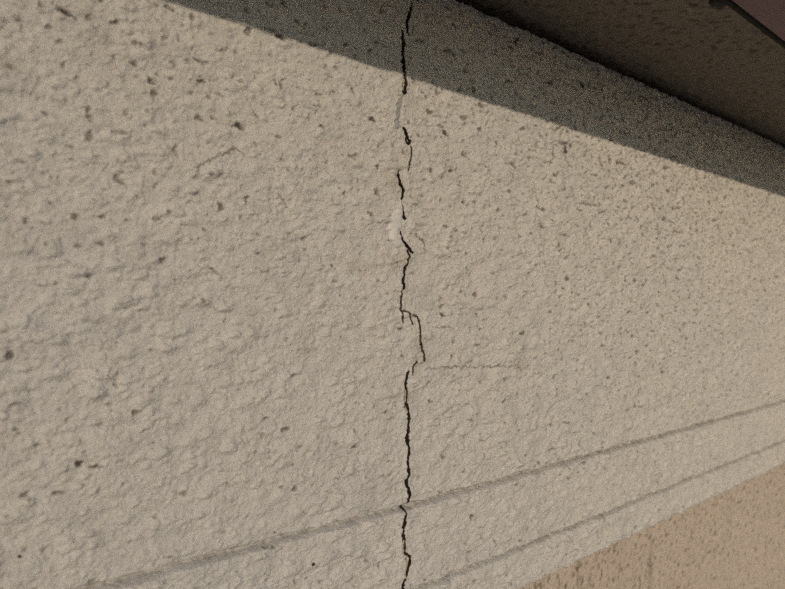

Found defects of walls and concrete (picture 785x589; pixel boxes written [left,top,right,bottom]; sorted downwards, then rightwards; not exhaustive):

crack [401,0,419,94]
crack [397,127,521,589]